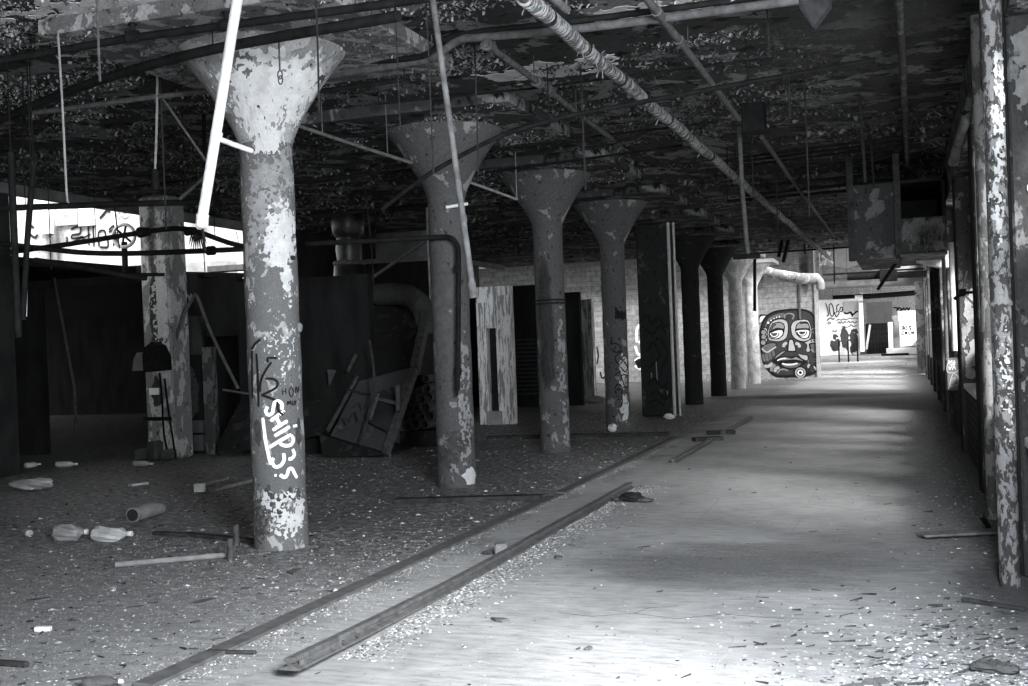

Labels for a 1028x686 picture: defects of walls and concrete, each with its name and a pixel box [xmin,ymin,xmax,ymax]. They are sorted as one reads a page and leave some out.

peeling [0,0,956,384]
peeling [988,25,1028,258]
peeling [151,370,171,411]
spalling [254,420,262,447]
peeling [432,264,476,485]
peeling [557,306,570,447]
peeling [942,284,976,379]
peeling [996,320,1028,450]
peeling [254,484,307,544]